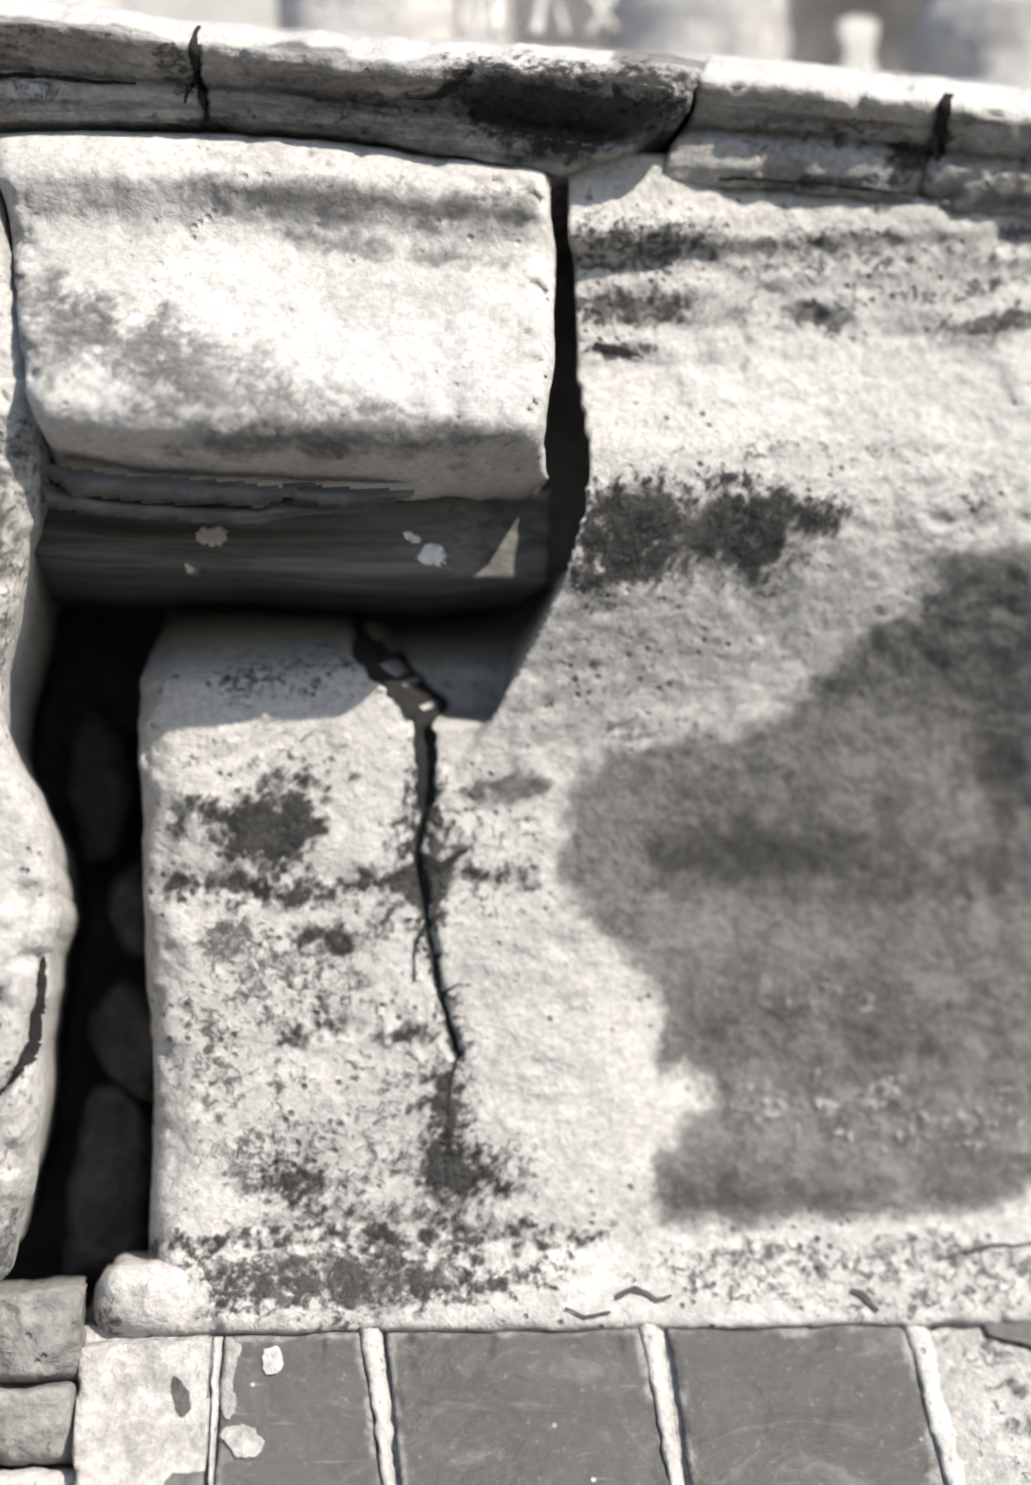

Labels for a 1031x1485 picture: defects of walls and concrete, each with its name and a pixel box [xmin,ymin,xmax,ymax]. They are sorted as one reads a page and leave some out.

crack [184,25,212,122]
crack [719,93,959,201]
leakage [559,465,857,613]
leakage [157,753,360,886]
crack [352,616,470,1120]
leakage [379,805,466,956]
leakage [460,771,552,804]
leakage [560,547,1031,1226]
leakage [372,1019,463,1047]
leakage [260,1058,537,1238]
peeling [171,1376,191,1417]